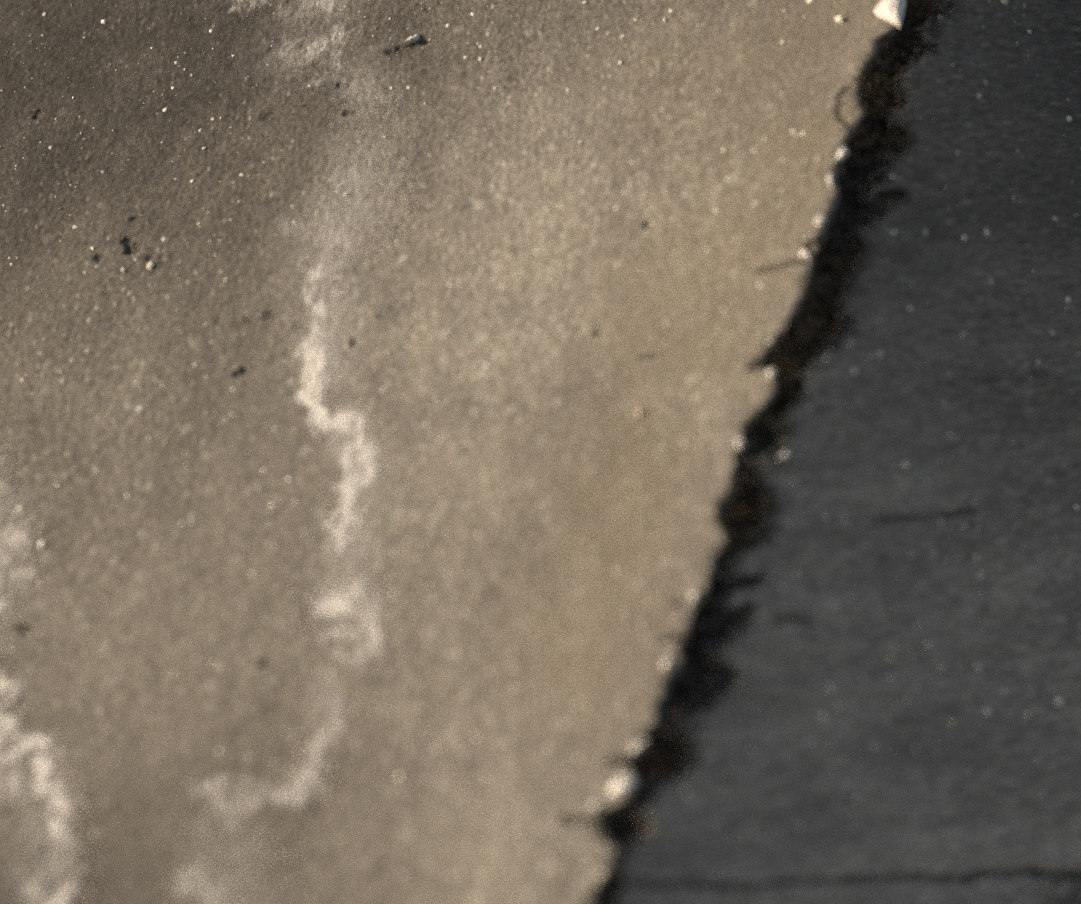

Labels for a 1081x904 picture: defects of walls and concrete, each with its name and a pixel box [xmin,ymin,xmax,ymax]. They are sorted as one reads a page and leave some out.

water stain [294,264,378,555]
crack [563,0,1081,904]
water stain [315,581,381,662]
water stain [0,675,72,856]
water stain [32,880,76,904]